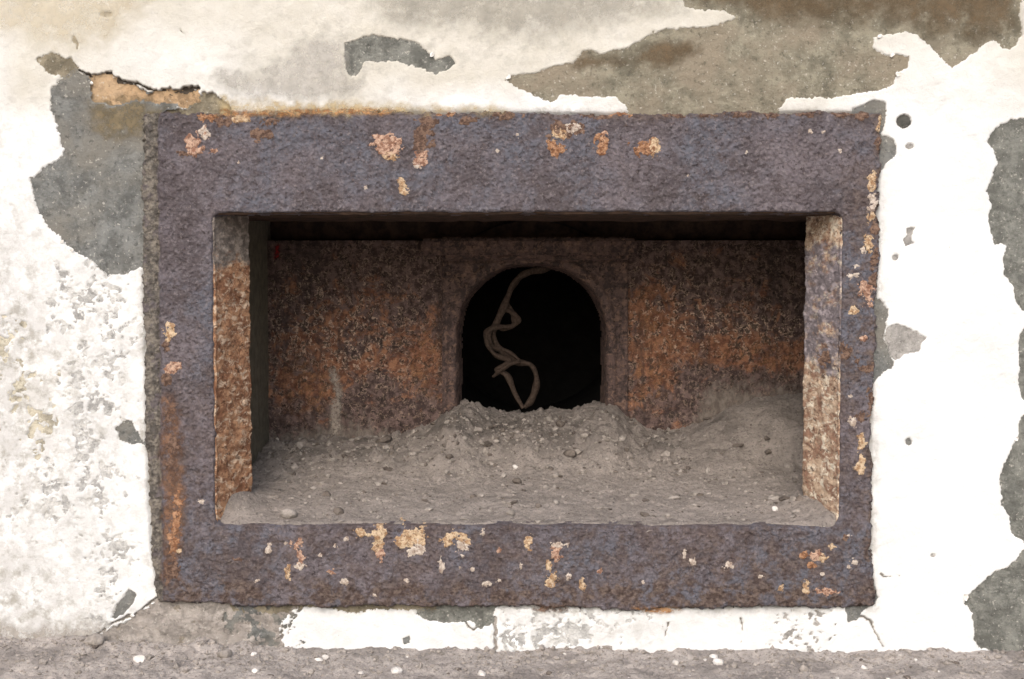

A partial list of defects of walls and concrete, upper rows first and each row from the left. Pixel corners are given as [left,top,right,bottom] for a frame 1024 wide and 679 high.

rust [176,96,525,169]
peeling [505,0,1022,174]
rust [846,170,880,315]
peeling [986,118,1024,311]
peeling [0,35,653,652]
rust [817,335,874,475]
peeling [872,298,926,384]
rust [353,517,471,563]
rust [544,542,572,588]
peeling [769,578,878,651]
rust [799,534,852,597]
peeling [963,415,1024,651]